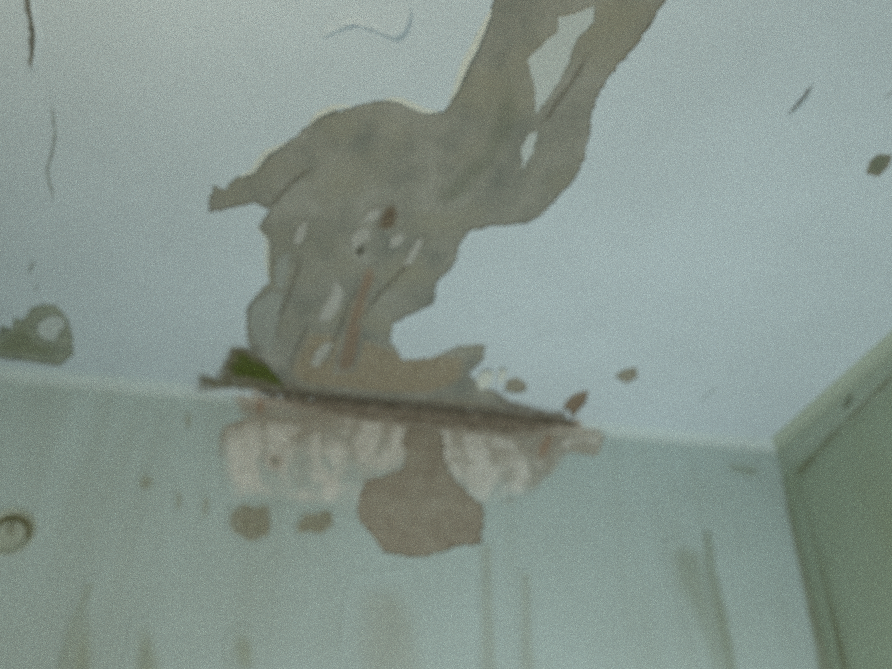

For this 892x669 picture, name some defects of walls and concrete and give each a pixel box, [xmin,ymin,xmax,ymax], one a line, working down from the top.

crack [21,0,45,77]
crack [46,97,57,207]
peeling [208,0,665,402]
peeling [0,304,74,365]
water stain [190,340,605,518]
spalling [563,391,588,417]